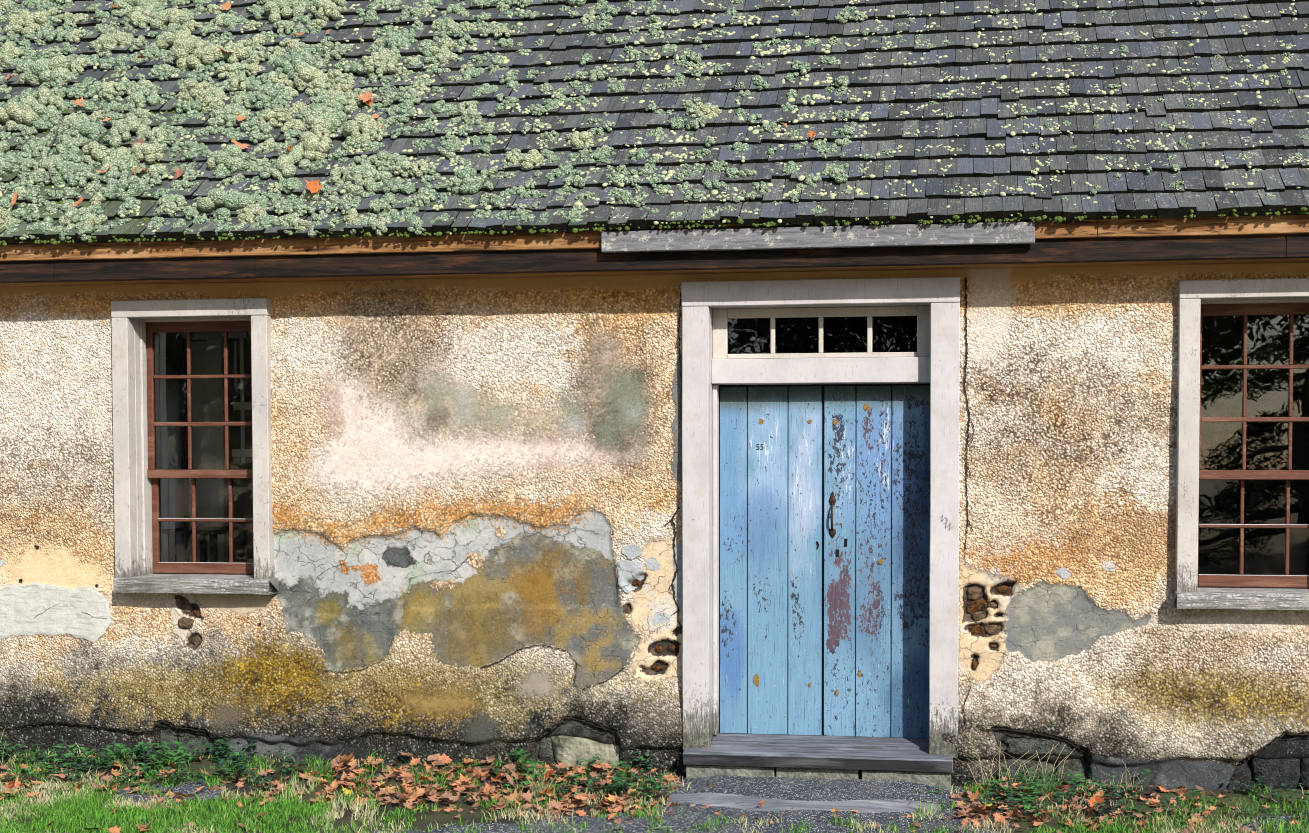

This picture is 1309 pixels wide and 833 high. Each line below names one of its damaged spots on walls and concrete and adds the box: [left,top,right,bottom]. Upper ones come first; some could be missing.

leakage [329,282,446,415]
crack [963,277,975,559]
spalling [171,509,683,683]
leakage [212,532,642,729]
spalling [958,558,1023,684]
leakage [1130,664,1309,733]